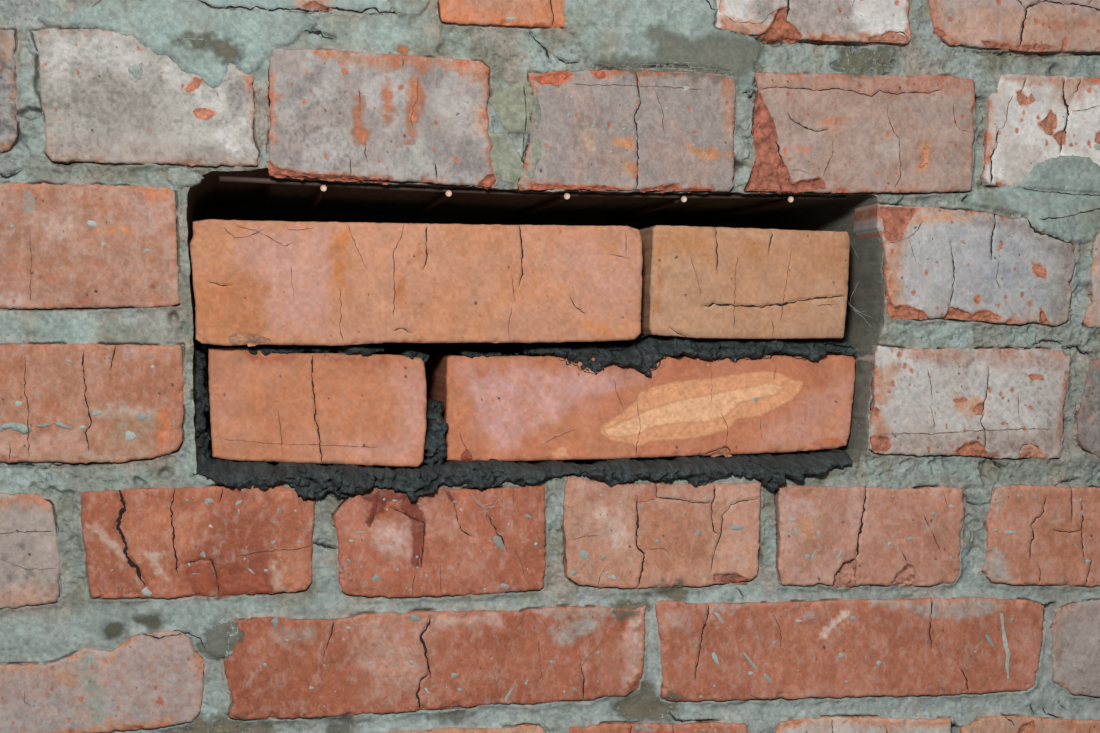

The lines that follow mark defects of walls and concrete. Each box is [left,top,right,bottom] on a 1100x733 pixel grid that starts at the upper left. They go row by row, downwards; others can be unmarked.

spalling [754,7,802,45]
crack [1018,0,1100,46]
spalling [744,92,826,194]
crack [761,80,1026,189]
spalling [1040,110,1066,145]
crack [1060,77,1096,153]
spalling [880,206,915,242]
crack [691,229,842,336]
spalling [885,295,928,321]
spalling [945,296,999,322]
crack [116,490,145,585]
crack [636,486,757,597]